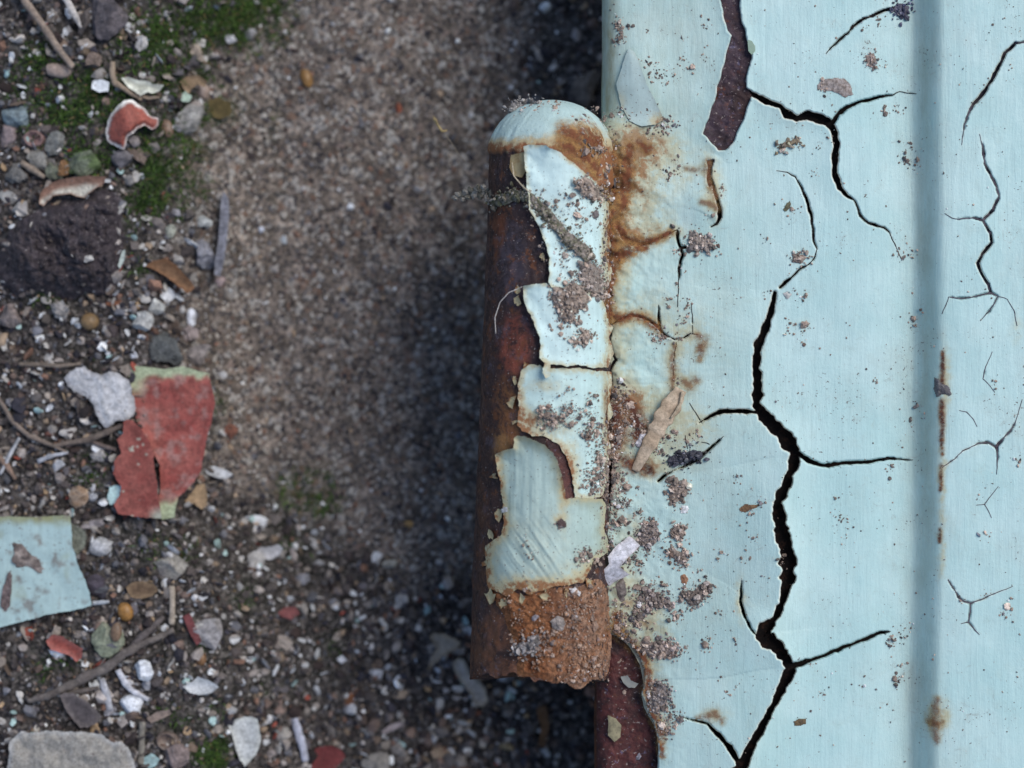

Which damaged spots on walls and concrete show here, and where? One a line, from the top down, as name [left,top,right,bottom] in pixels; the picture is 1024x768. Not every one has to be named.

corrosion [556,122,674,334]
crack [609,152,696,375]
corrosion [686,159,718,210]
peeling [703,0,755,186]
crack [749,90,916,258]
crack [826,7,894,54]
crack [942,41,1024,324]
peeling [481,145,614,608]
corrosion [606,388,656,476]
crack [657,170,910,768]
corrosion [492,579,666,758]
peeling [616,578,627,602]